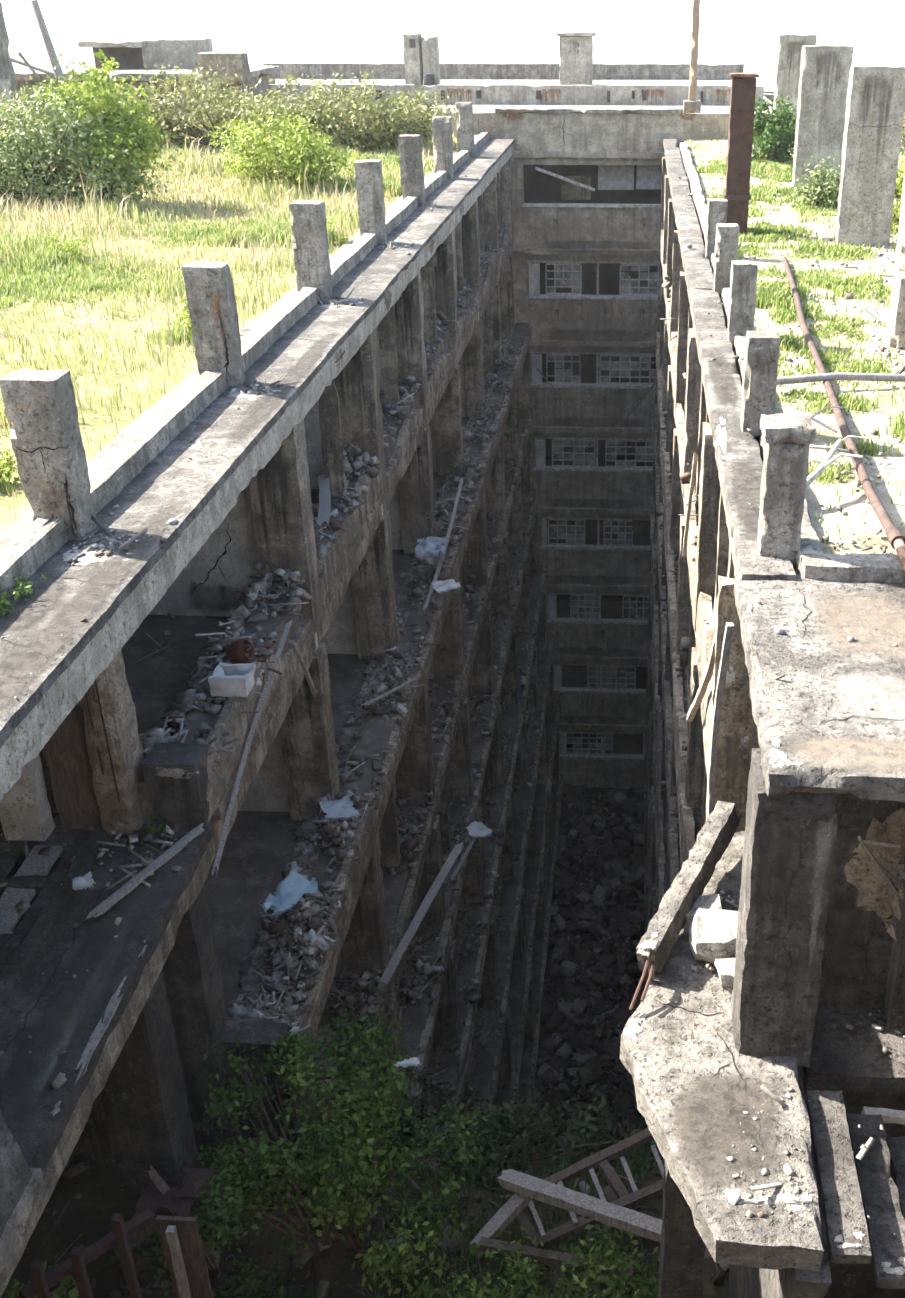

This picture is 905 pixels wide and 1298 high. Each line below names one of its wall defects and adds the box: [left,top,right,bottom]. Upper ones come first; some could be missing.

crack [16,447,77,531]
flaking render [844,808,905,941]
crack [654,999,747,1084]